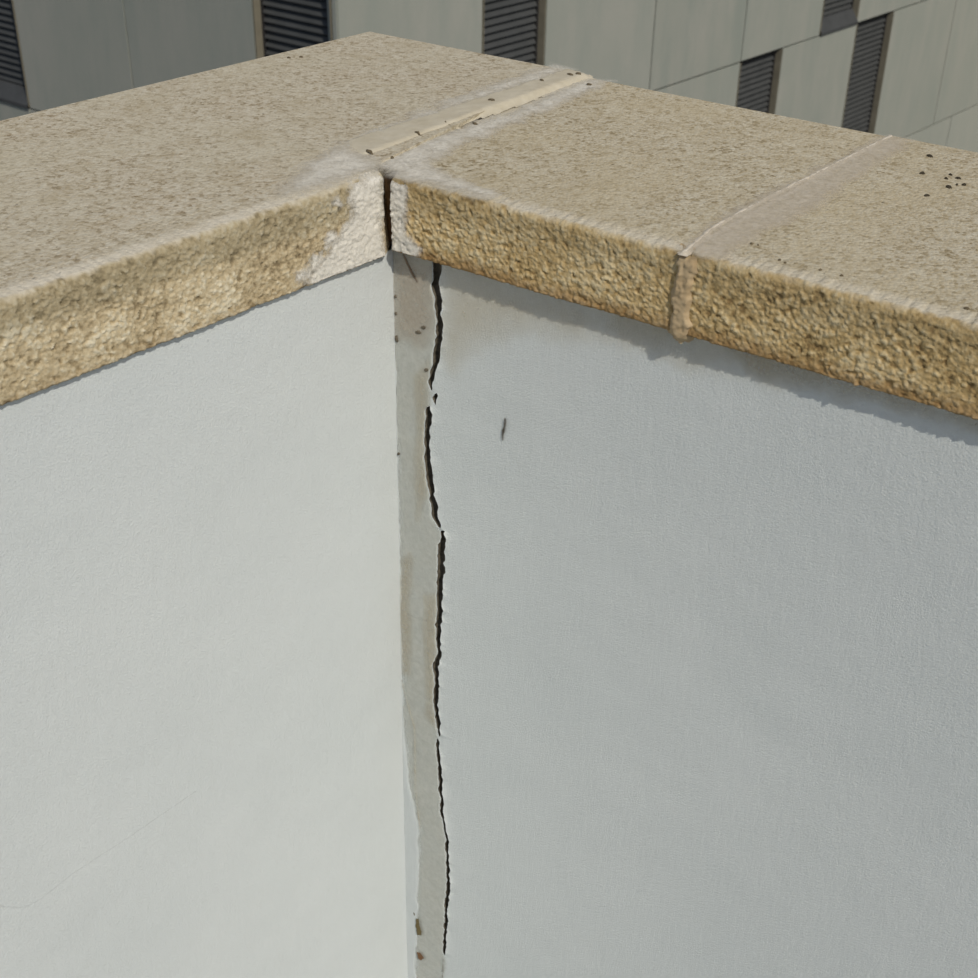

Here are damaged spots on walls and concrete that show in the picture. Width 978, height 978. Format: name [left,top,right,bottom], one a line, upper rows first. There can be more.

crack [403,254,450,977]